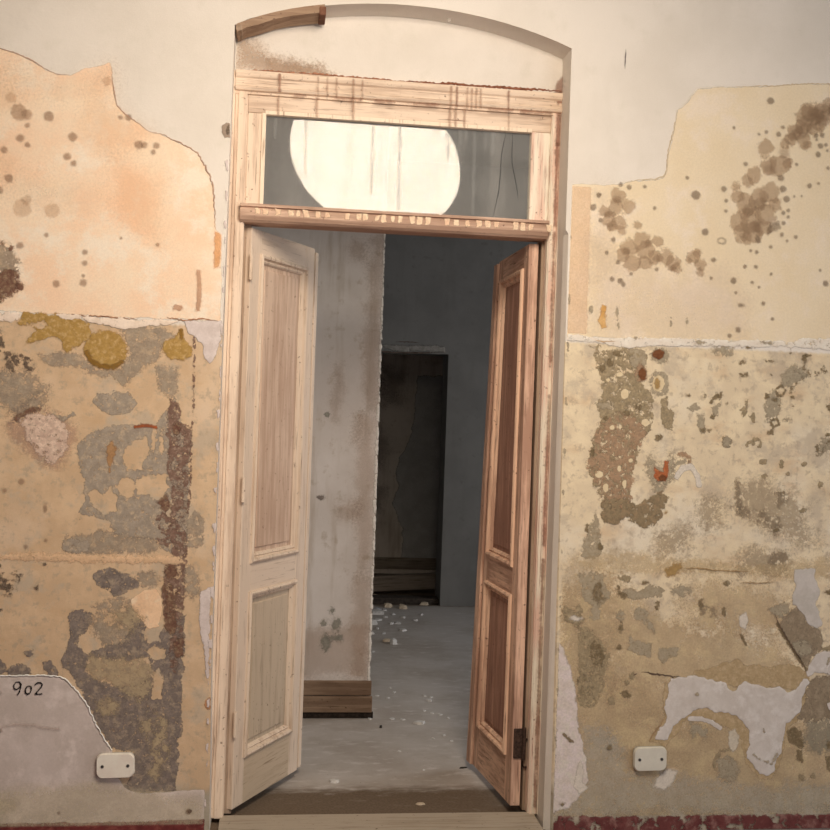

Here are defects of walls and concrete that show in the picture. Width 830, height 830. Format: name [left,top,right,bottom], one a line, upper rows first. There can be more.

spalling [222,123,230,138]
damp [0,240,24,303]
peeling [0,48,227,415]
peeling [567,83,830,559]
peeling [15,407,192,555]
peeling [0,649,34,675]
peeling [42,567,186,792]
peeling [199,586,214,685]
peeling [560,571,692,663]
peeling [739,612,748,646]